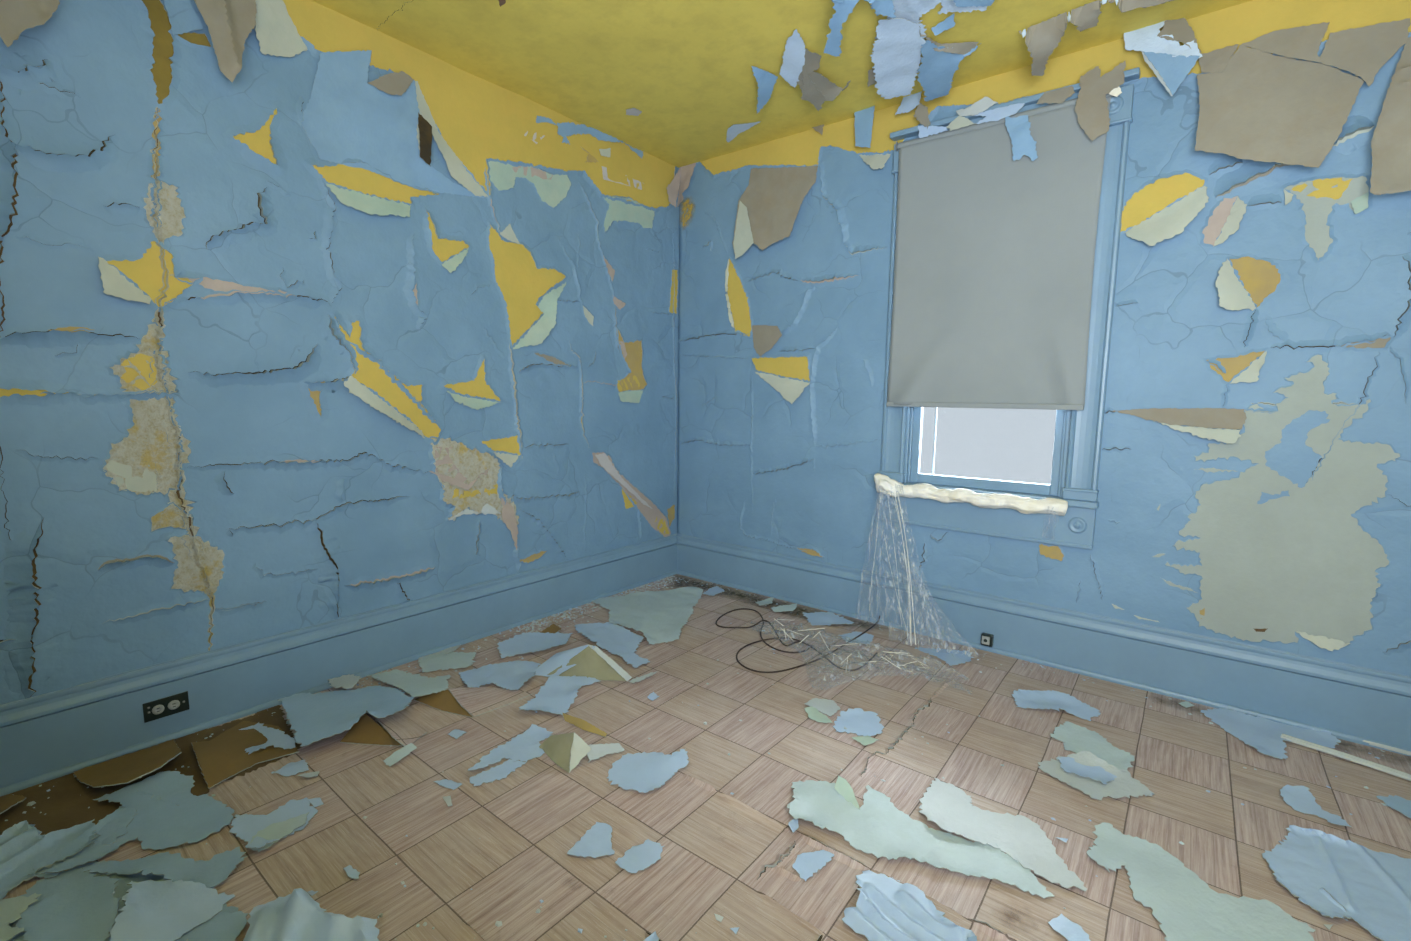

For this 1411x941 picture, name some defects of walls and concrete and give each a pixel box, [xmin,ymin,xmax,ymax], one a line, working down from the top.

flaking render [283,0,1174,234]
flaking render [1179,0,1411,84]
crack [0,77,433,700]
peeling [427,434,521,573]
peeling [616,328,648,403]
flaking render [1153,353,1402,652]
crack [1239,198,1411,483]
crack [1381,631,1411,656]